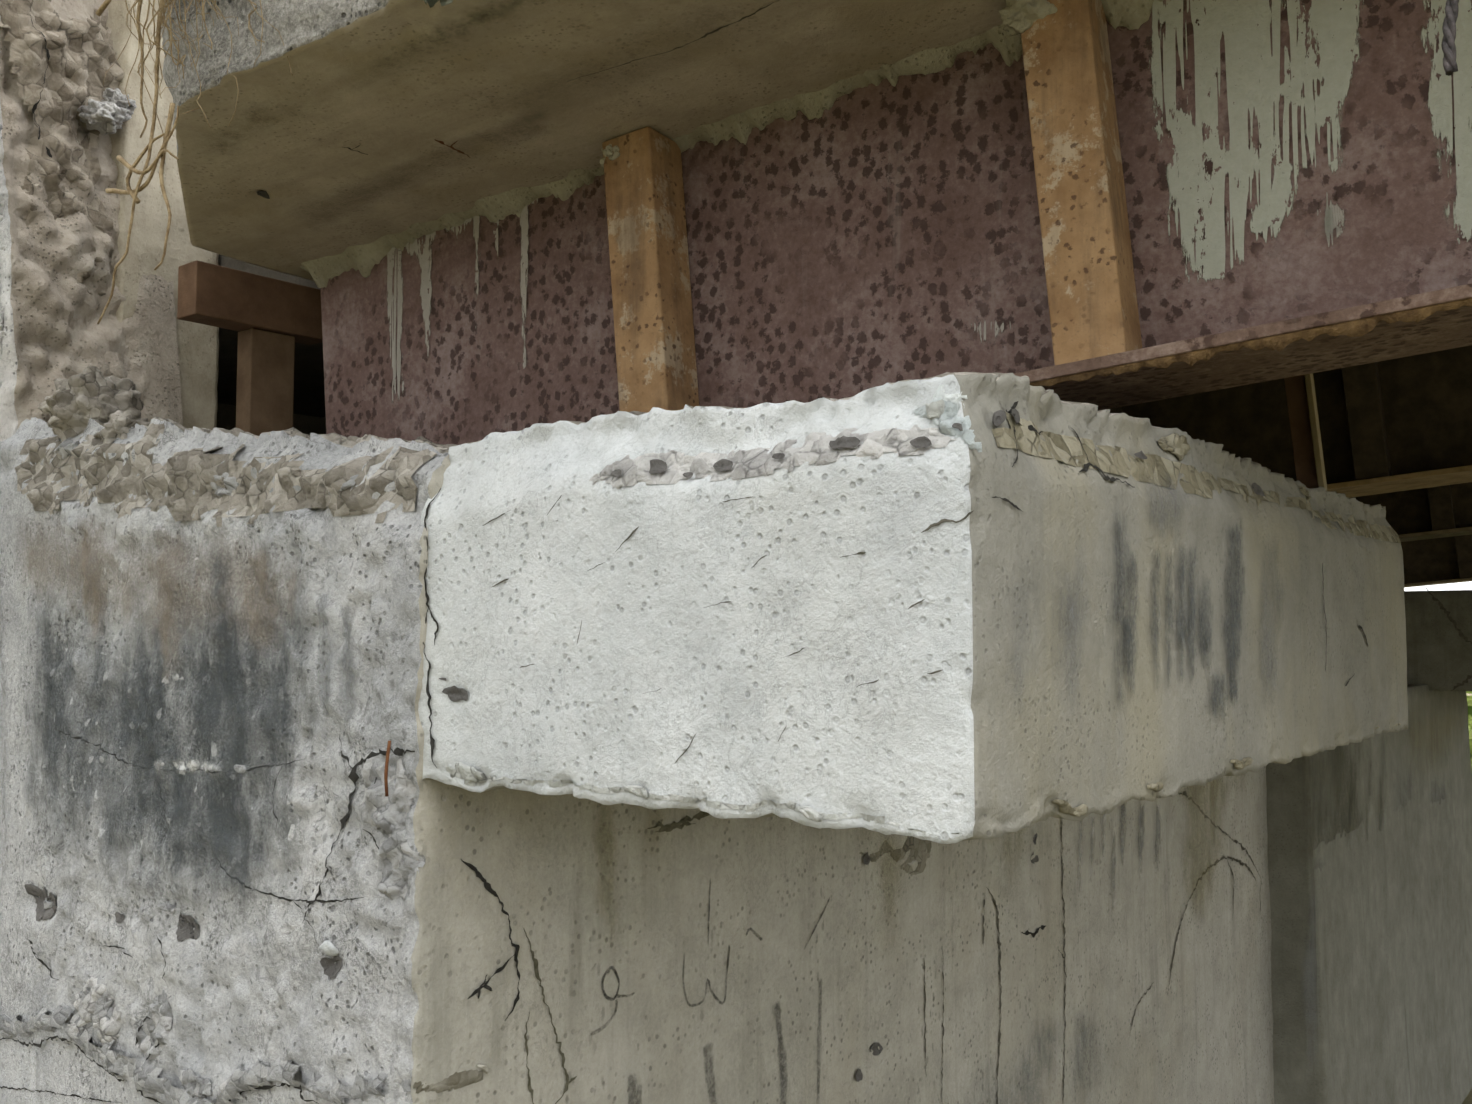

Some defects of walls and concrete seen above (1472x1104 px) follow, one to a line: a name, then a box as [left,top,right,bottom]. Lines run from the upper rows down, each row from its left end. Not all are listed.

spalling [0,0,124,322]
leakage [27,531,288,881]
spalling [15,423,437,527]
crack [217,488,441,944]
leakage [316,595,353,720]
crack [589,527,639,570]
spalling [910,384,982,452]
leakage [1126,527,1244,713]
flaking render [0,977,489,1104]
crack [461,859,577,1104]
crack [983,820,1067,1104]
crack [1129,791,1262,1037]